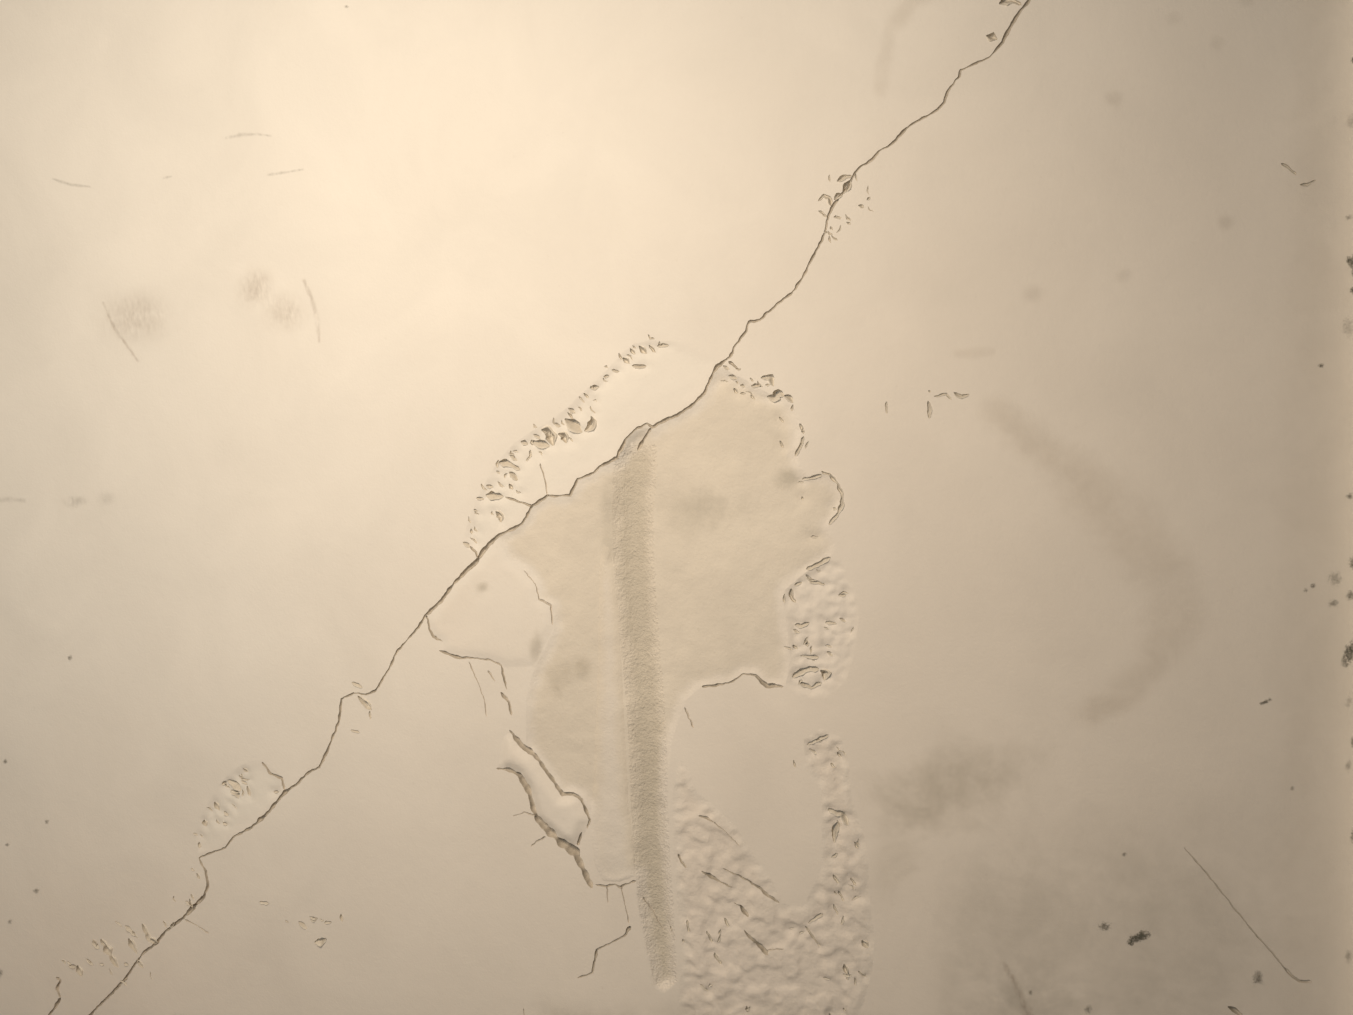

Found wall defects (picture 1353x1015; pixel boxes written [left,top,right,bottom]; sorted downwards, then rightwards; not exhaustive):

spalling [927,390,969,418]
crack [48,0,1031,1015]
spalling [428,335,875,1015]
spalling [62,921,175,986]
crack [1184,847,1312,983]